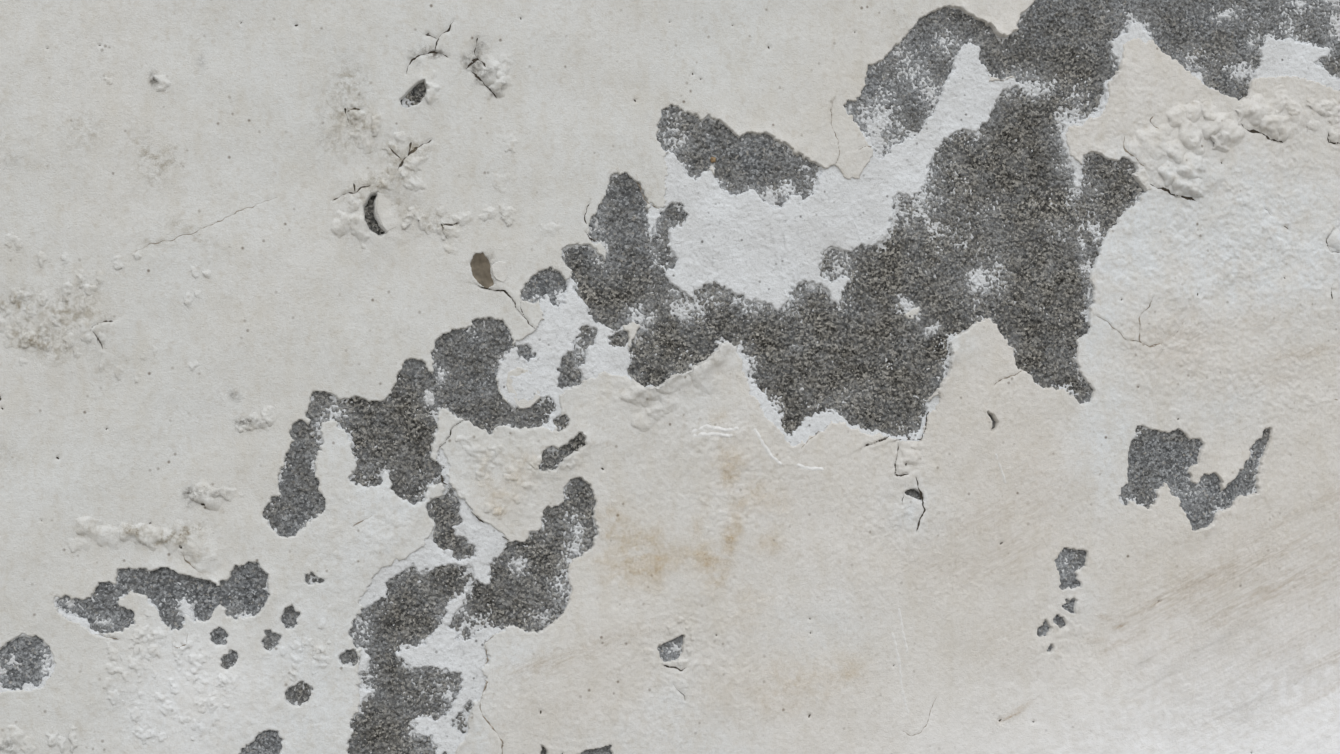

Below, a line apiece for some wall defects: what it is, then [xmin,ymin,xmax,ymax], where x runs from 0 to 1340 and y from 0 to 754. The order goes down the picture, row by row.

peeling [400,82,426,107]
peeling [364,192,403,235]
peeling [562,0,1340,446]
peeling [470,252,508,288]
peeling [1119,426,1269,531]
peeling [262,267,634,754]
peeling [54,562,270,669]
peeling [1037,548,1086,651]
peeling [0,633,56,693]
peeling [657,635,683,662]
peeling [240,730,282,754]